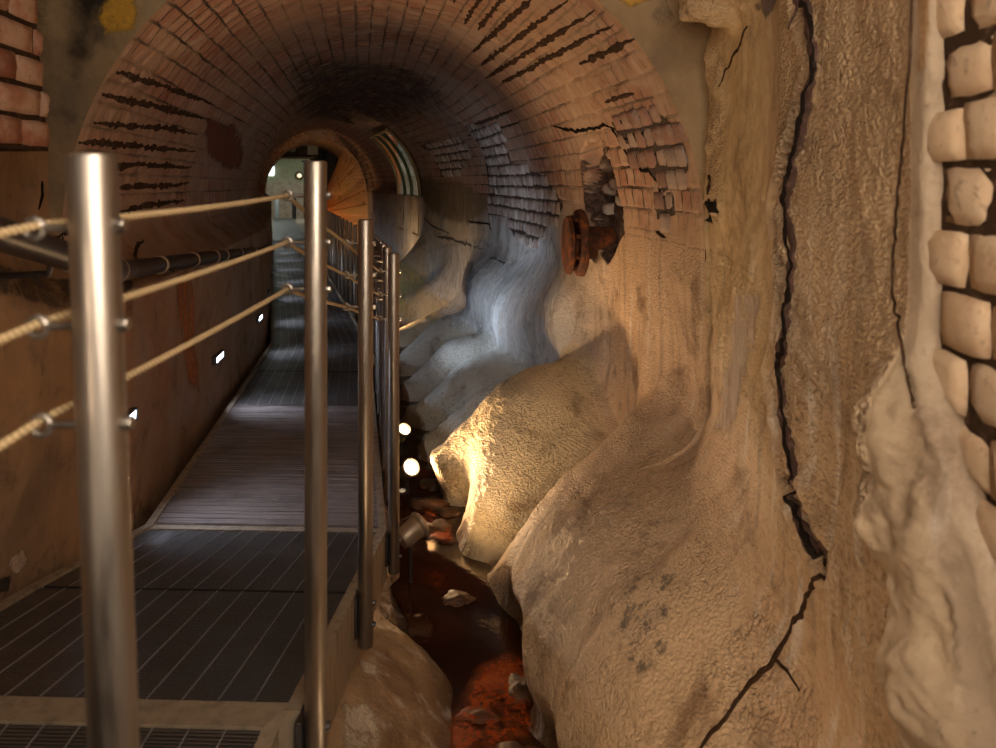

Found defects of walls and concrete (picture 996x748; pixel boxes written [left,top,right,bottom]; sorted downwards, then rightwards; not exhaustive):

peeling [99,0,137,33]
spalling [580,104,689,264]
crack [699,0,828,748]
crack [890,0,916,409]
spalling [927,0,996,561]